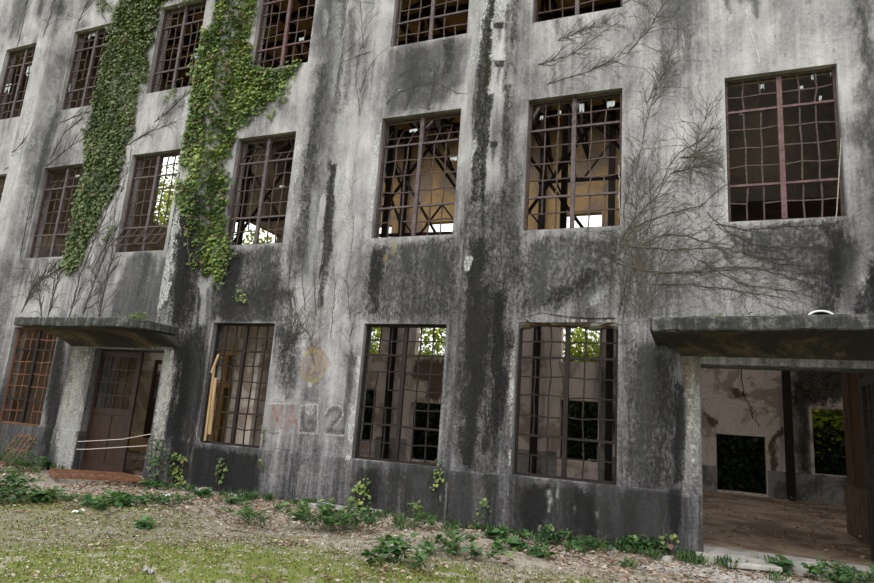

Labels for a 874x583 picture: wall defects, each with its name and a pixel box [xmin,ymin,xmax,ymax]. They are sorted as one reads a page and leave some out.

leakage [112,194,300,493]
leakage [293,0,353,306]
leakage [362,0,619,490]
leakage [730,217,874,314]
leakage [351,467,450,520]